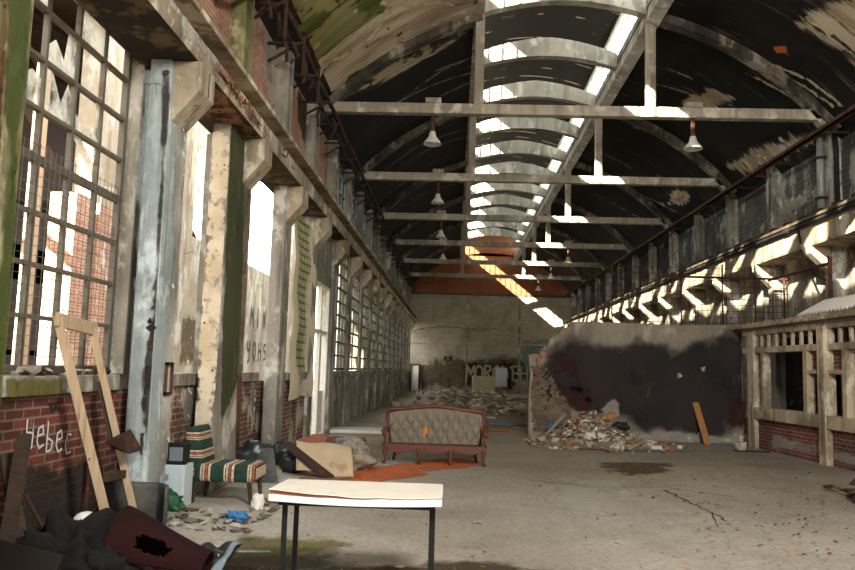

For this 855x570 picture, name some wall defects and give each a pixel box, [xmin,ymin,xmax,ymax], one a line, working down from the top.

damp [291,0,467,77]
peeling [795,0,855,66]
peeling [682,87,734,108]
peeling [727,132,814,176]
spalling [521,340,571,433]
damp [222,554,520,570]